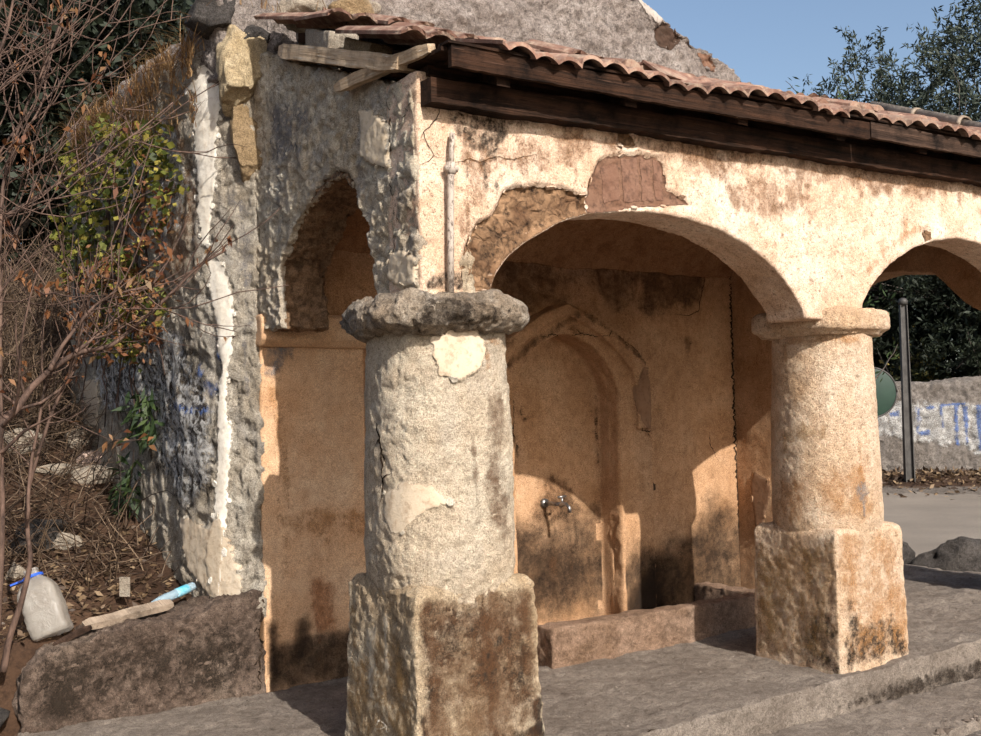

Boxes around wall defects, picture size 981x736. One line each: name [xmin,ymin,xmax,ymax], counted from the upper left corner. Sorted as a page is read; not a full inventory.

spalling [460,133,689,291]
flaking render [430,329,486,383]
crack [376,423,392,502]
flaking render [382,481,455,537]
leakage [269,607,355,690]
leakage [421,457,603,736]
leakage [626,510,742,610]
leakage [755,543,906,672]
leakage [849,660,981,708]